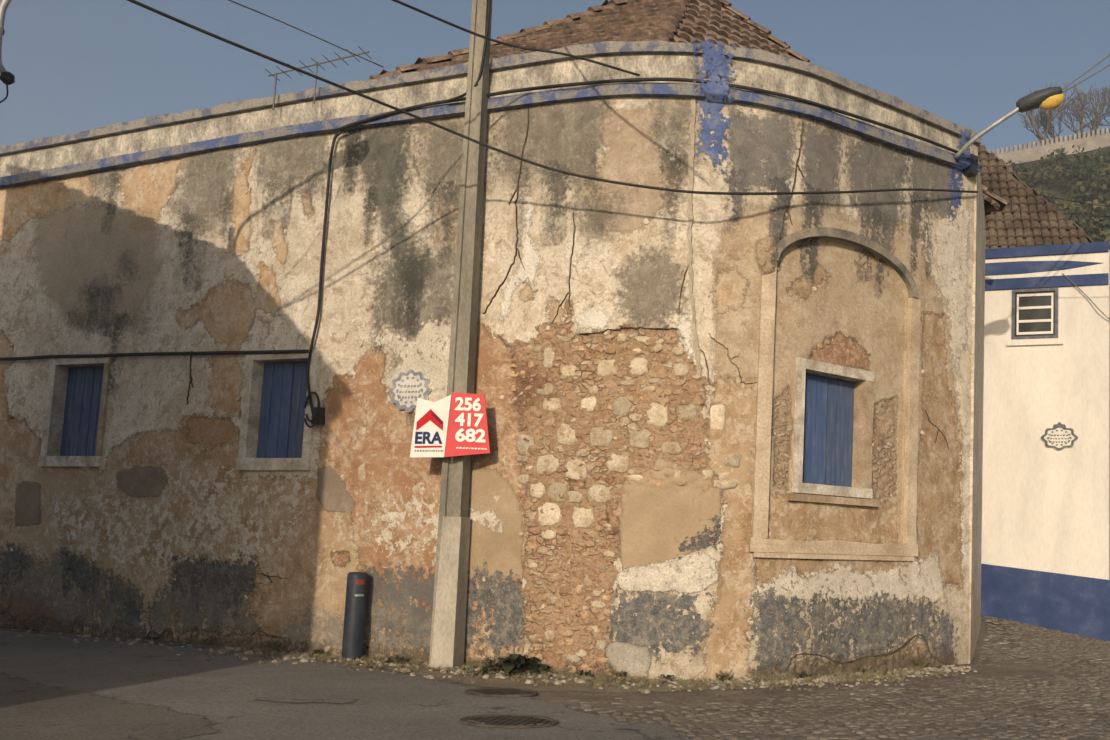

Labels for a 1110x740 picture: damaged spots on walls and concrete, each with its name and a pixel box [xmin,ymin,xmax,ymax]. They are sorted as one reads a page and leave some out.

damp [174,146,240,280]
peeling [226,149,258,257]
damp [344,116,464,366]
crack [482,106,529,314]
crack [552,213,576,324]
crack [579,98,755,384]
peeling [692,33,737,174]
crack [779,121,804,241]
damp [719,104,952,304]
peeling [0,217,443,659]
flaking render [464,207,965,680]
damp [750,638,958,680]